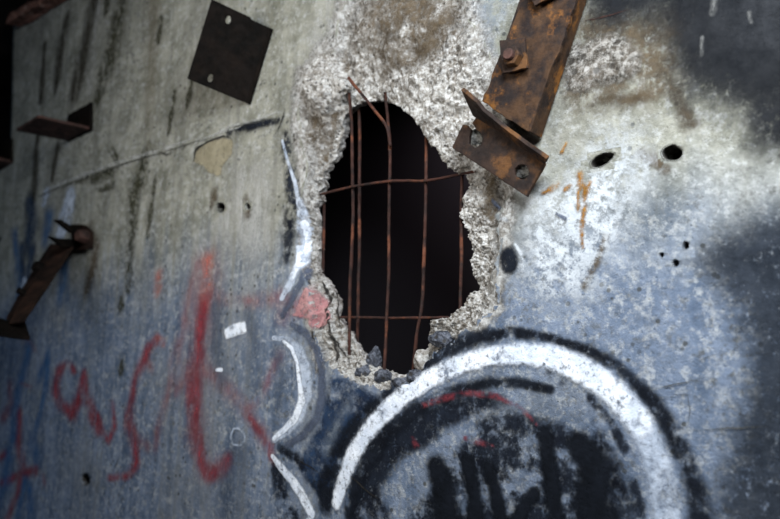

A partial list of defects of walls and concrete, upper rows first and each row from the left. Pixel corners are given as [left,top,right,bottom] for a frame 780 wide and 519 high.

water stain [54,13,69,93]
water stain [70,0,125,105]
water stain [31,135,39,204]
flaking render [192,127,239,176]
spalling [290,0,523,391]
rust [541,173,591,247]